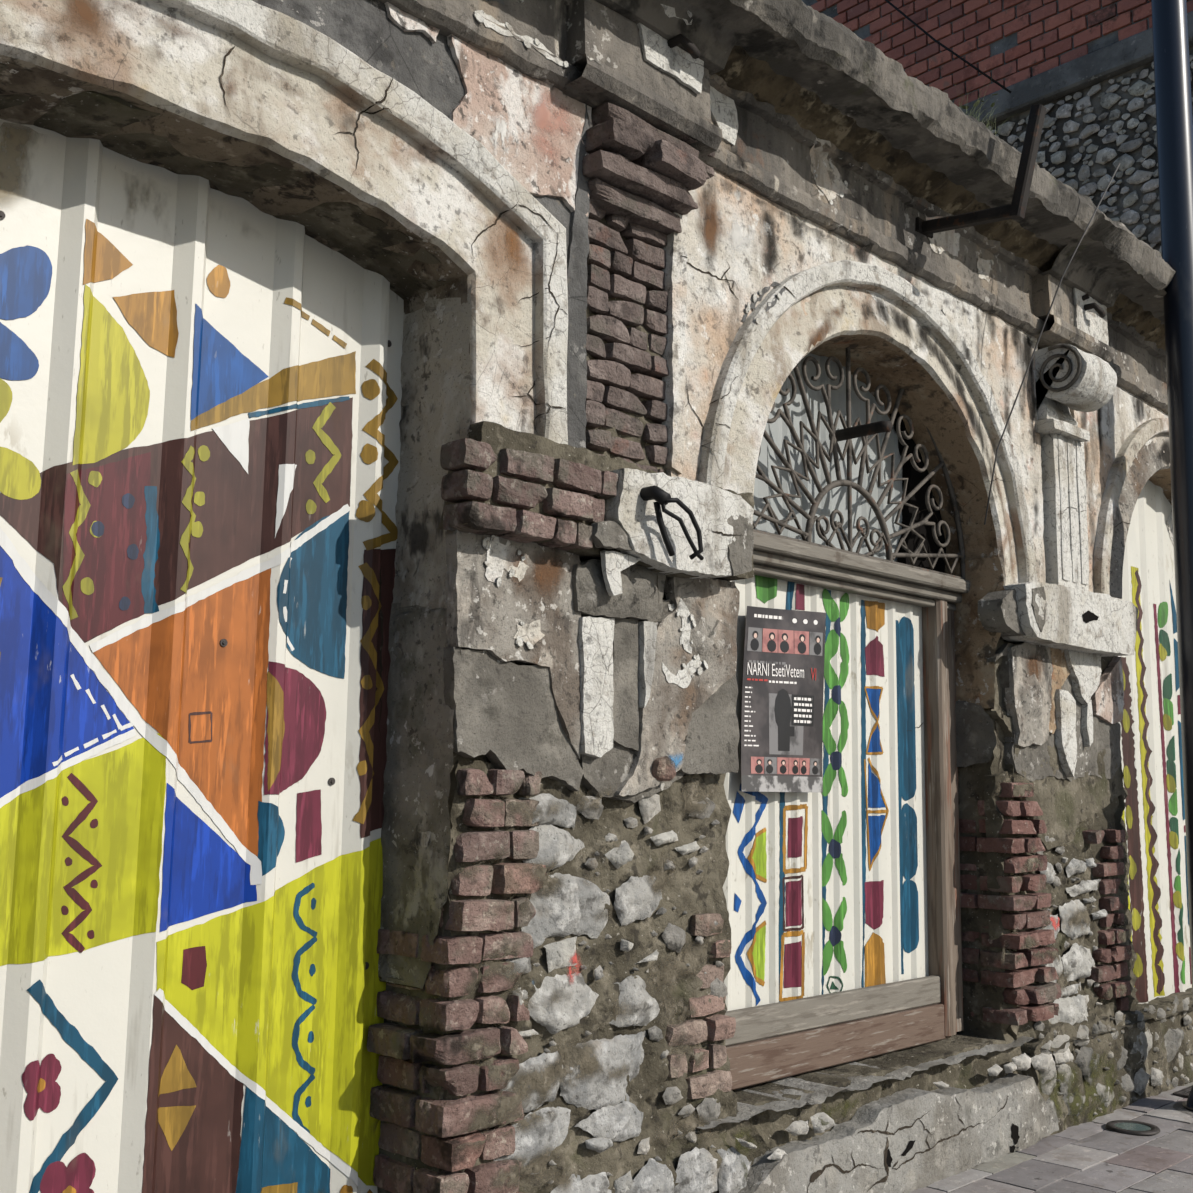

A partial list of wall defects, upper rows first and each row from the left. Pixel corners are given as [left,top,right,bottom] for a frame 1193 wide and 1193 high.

crack [220,46,235,117]
crack [336,78,393,177]
flaking render [482,535,529,588]
spalling [591,521,633,551]
flaking render [514,620,545,649]
flaking render [662,599,708,688]
spalling [959,771,1139,1044]
crack [807,1097,1008,1193]